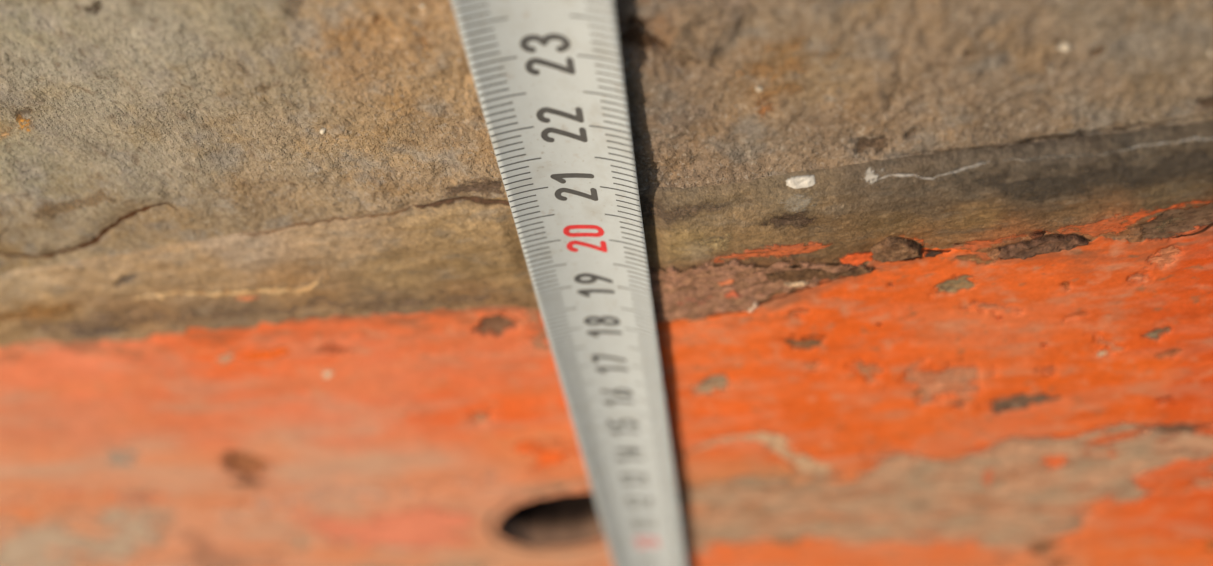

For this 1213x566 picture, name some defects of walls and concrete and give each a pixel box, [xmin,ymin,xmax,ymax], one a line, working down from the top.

spalling [649,201,1213,322]
peeling [785,335,827,372]
peeling [1143,327,1181,357]
peeling [691,374,729,393]
peeling [903,367,979,407]
peeling [991,394,1060,414]
peeling [678,423,1213,566]